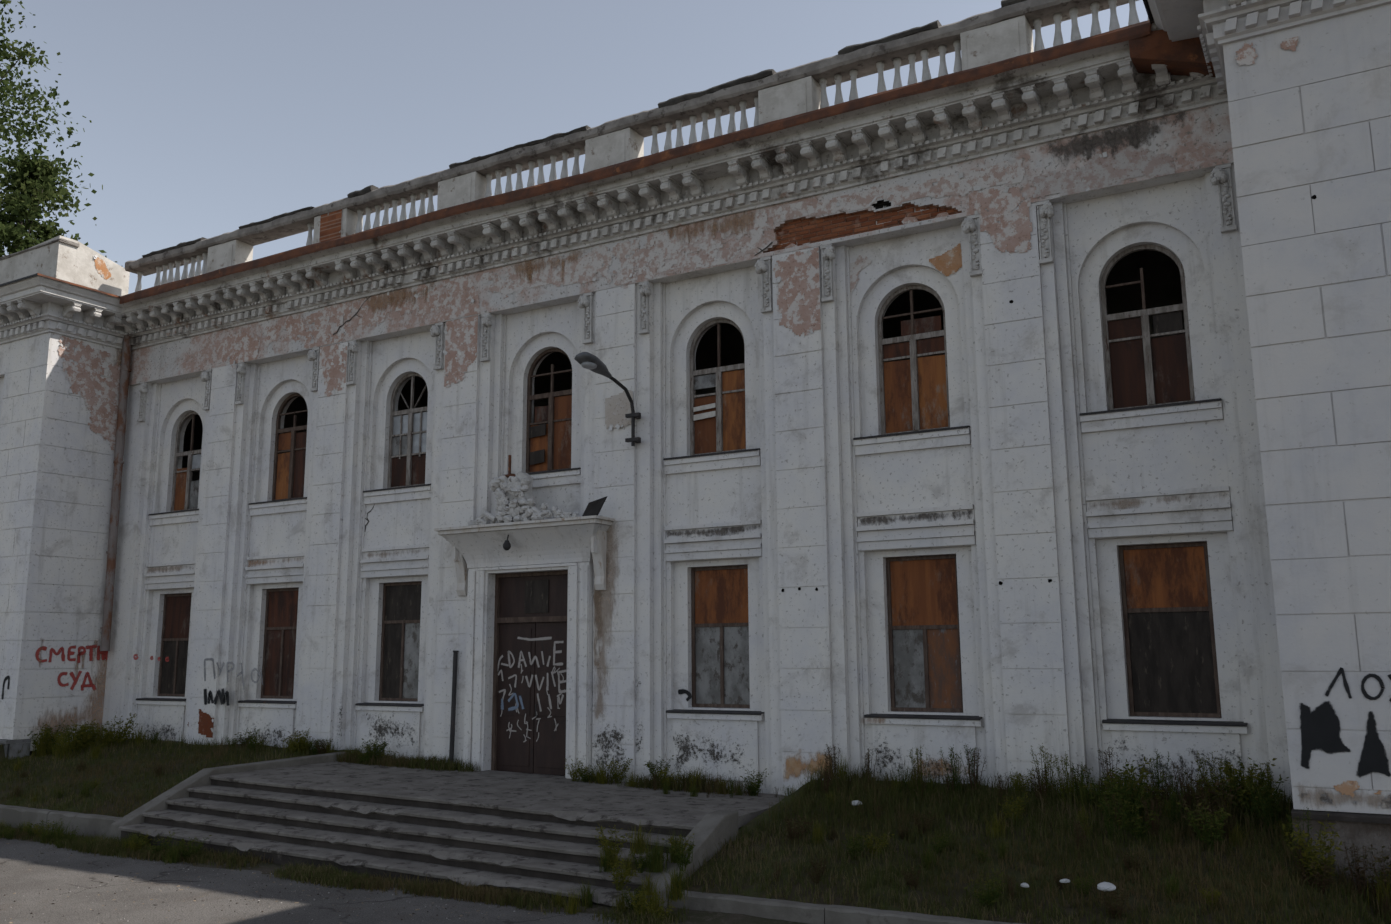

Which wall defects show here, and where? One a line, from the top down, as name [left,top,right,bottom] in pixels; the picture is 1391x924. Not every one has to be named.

peeling [58,336,127,453]
peeling [264,146,1175,397]
leakage [593,529,643,779]